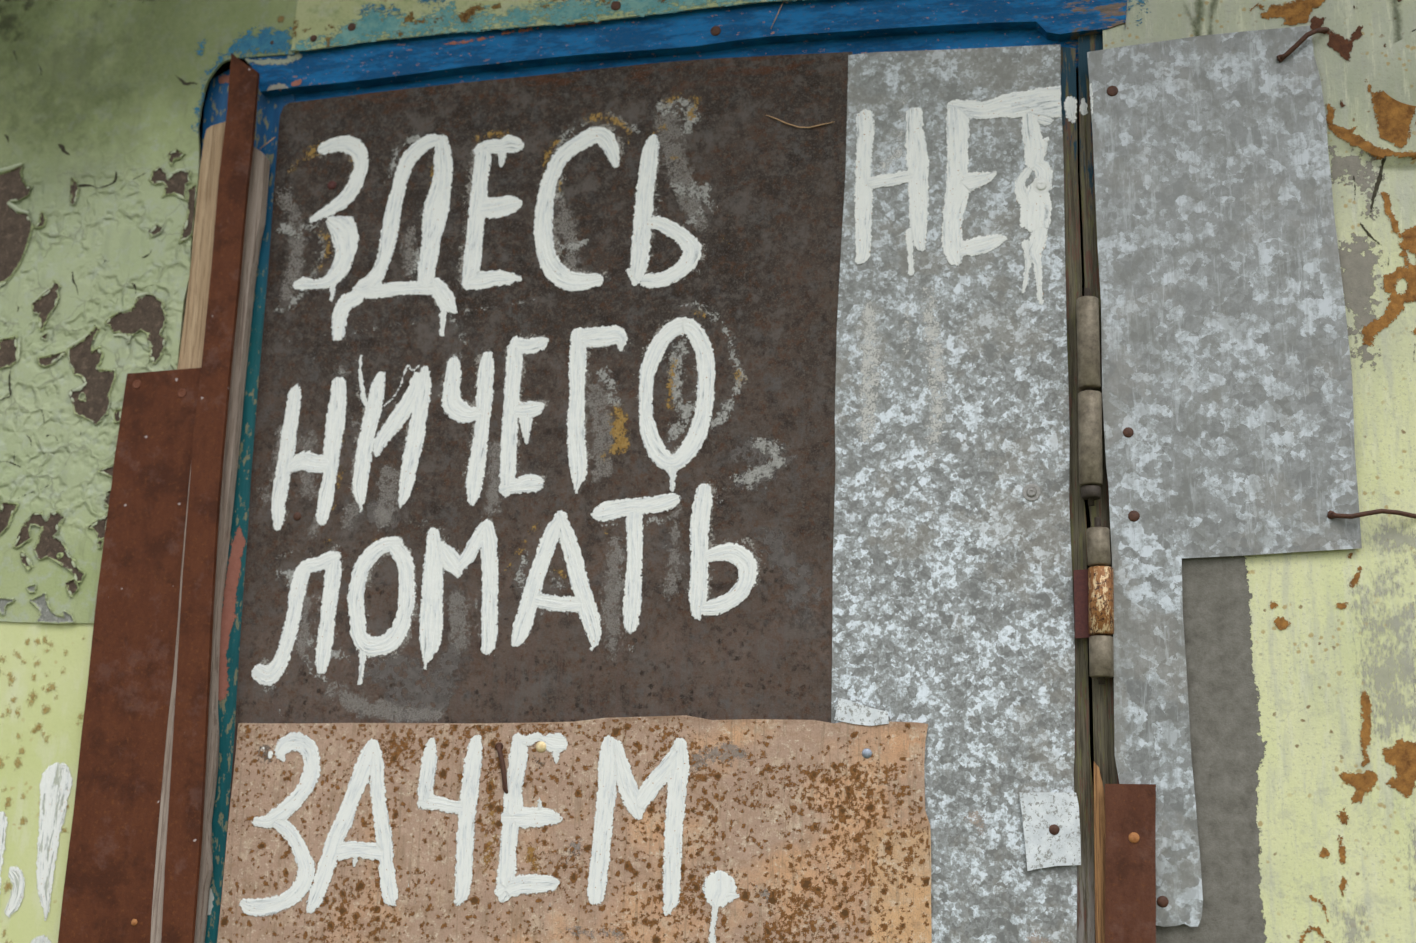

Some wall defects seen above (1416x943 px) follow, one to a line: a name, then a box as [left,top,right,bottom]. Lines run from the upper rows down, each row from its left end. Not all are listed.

corrosion [1250,0,1325,26]
corrosion [1326,79,1416,160]
peeling [0,163,47,286]
peeling [148,147,197,245]
corrosion [1362,192,1416,347]
peeling [0,335,20,369]
peeling [31,279,167,426]
peeling [88,464,113,551]
peeling [0,495,86,624]
corrosion [1270,602,1291,630]
corrosion [1335,553,1363,609]
corrosion [1319,691,1416,897]